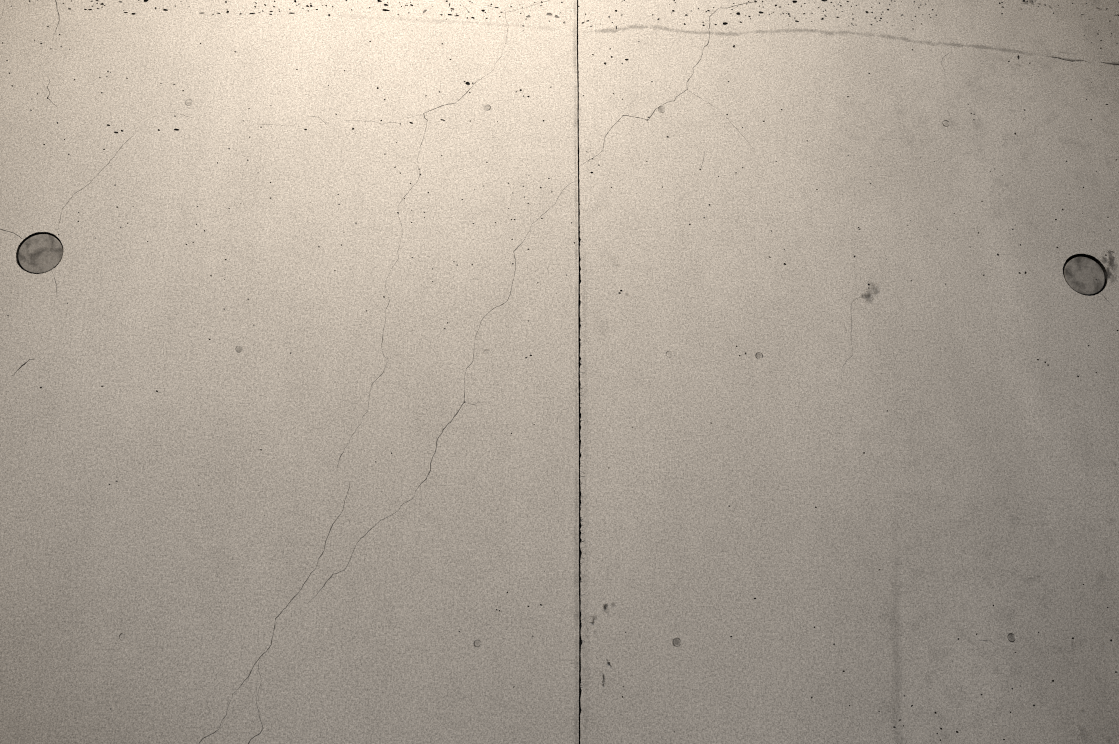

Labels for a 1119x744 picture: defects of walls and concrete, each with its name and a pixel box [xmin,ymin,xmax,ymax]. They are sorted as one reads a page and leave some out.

crack [199,0,773,744]